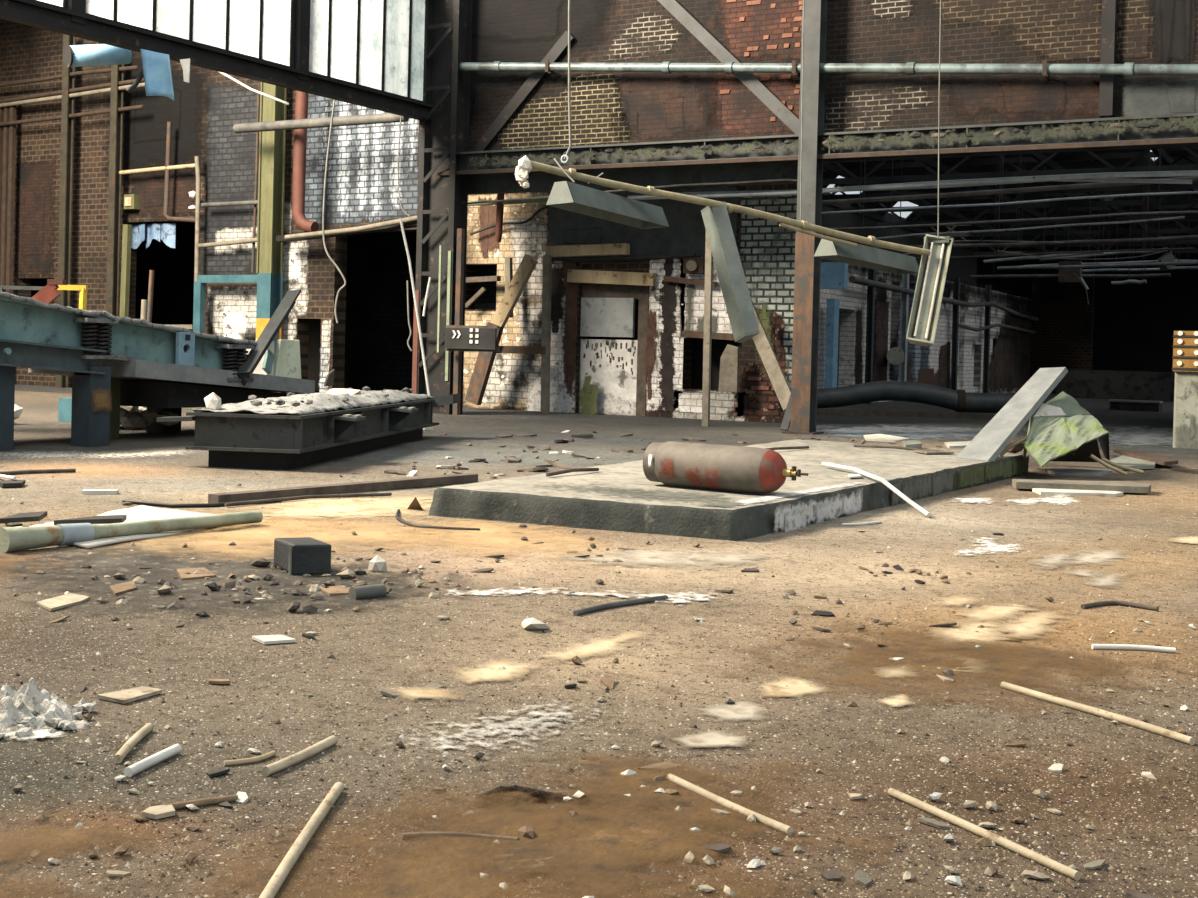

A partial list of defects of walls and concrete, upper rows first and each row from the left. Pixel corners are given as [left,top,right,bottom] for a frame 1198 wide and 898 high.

spalling [468,0,802,167]
peeling [208,287,257,339]
peeling [282,240,308,340]
peeling [463,192,602,409]
peeling [646,195,797,421]